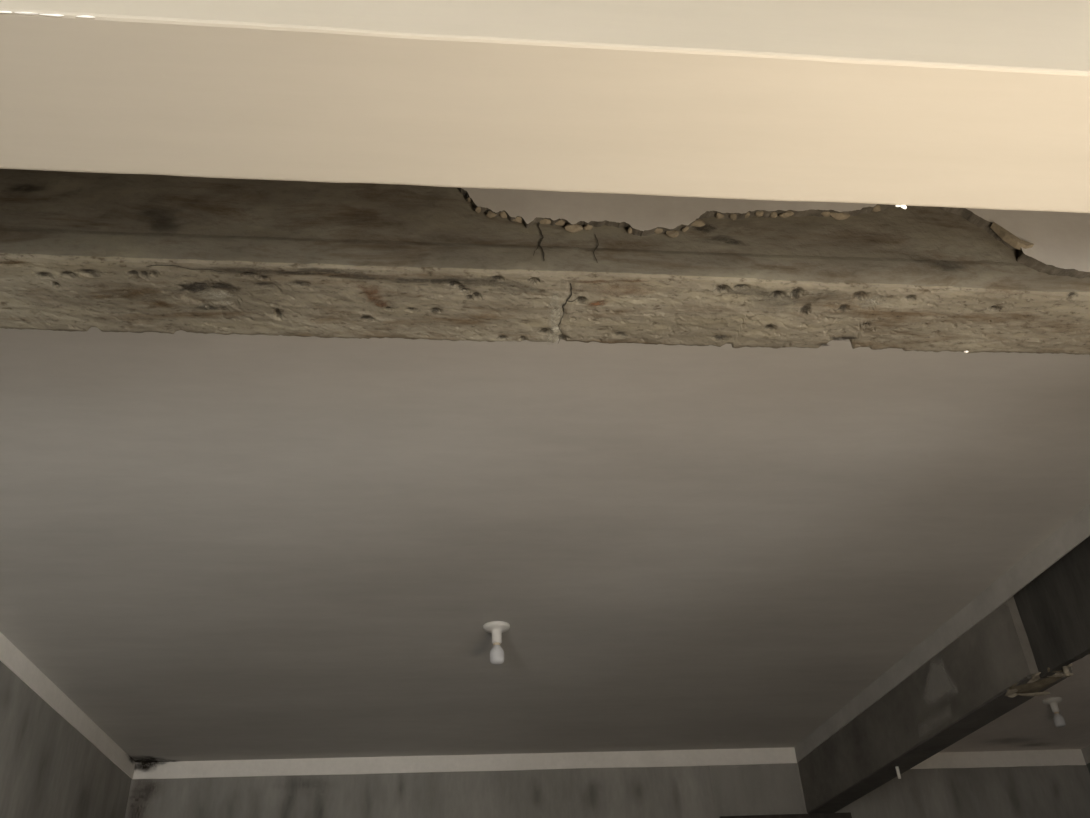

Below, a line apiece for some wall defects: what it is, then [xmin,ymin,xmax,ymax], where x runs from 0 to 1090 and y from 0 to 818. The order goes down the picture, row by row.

peeling [457,187,923,238]
peeling [937,207,1090,278]
crack [548,283,583,343]